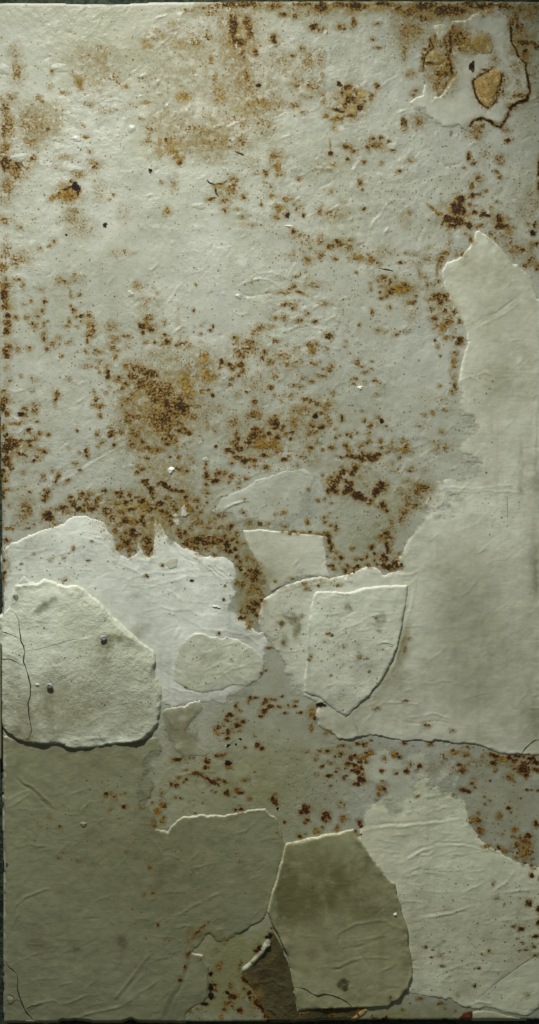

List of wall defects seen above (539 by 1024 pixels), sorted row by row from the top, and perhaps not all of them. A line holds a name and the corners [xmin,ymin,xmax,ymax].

peeling [434,24,448,41]
rust [0,1,539,632]
peeling [173,505,190,526]
peeling [13,576,35,601]
crack [4,611,74,741]
rust [140,695,539,879]
rust [177,920,276,1022]
spalling [242,932,368,1023]
rust [511,900,539,956]